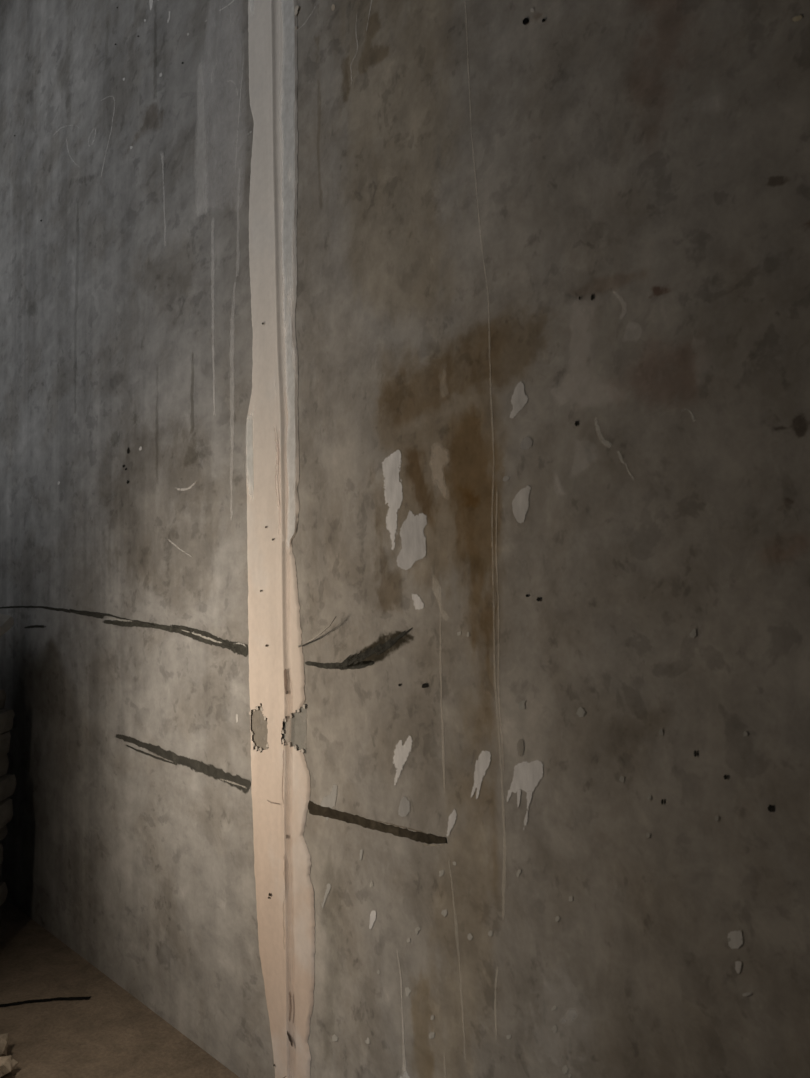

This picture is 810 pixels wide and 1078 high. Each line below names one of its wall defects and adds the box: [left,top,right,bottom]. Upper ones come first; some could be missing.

crack [0,606,249,657]
crack [281,670,289,694]
spalling [236,704,269,752]
spalling [282,704,307,753]
crack [116,734,447,846]
crack [286,993,294,1046]